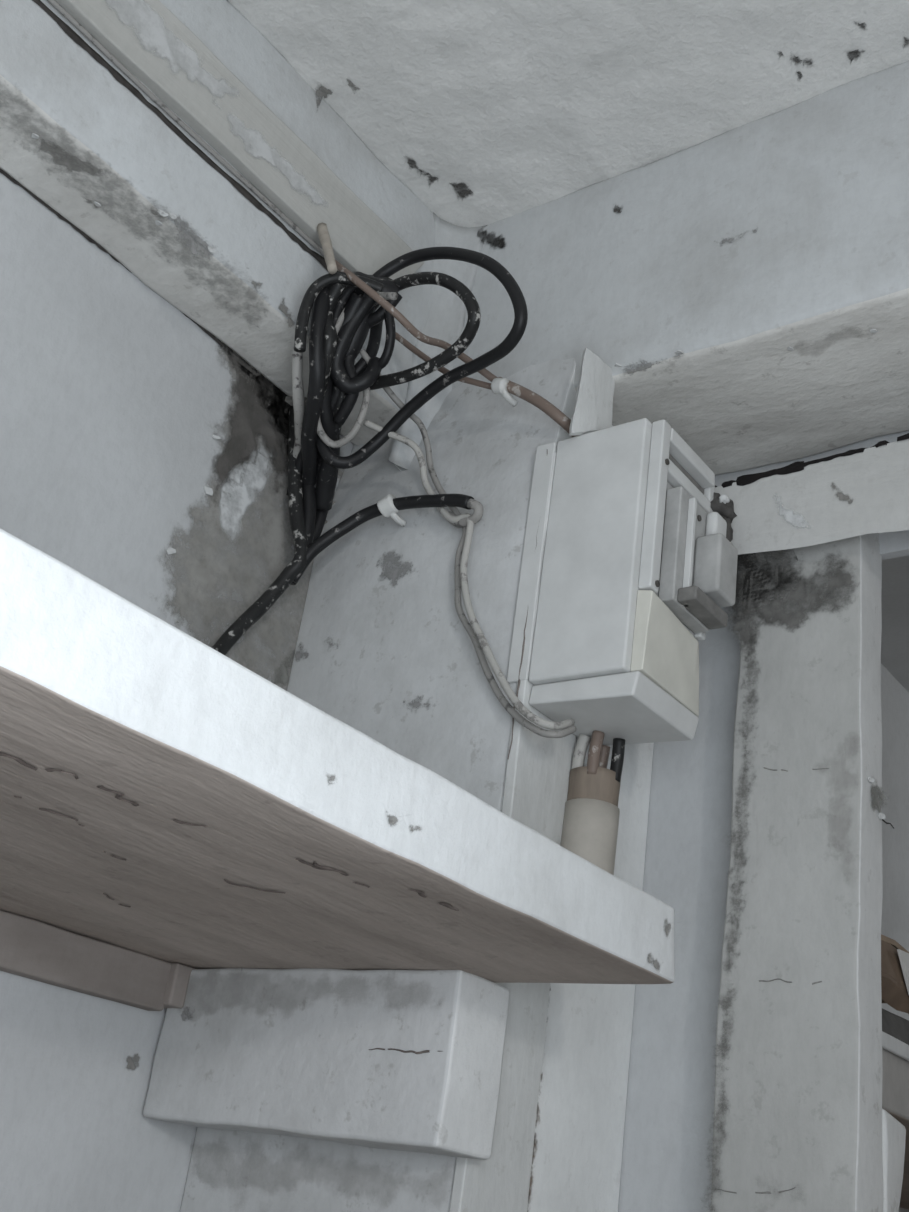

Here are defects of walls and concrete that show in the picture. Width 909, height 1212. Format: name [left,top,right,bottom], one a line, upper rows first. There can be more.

spalling [32,133,101,176]
peeling [165,345,314,691]
crack [0,752,139,806]
crack [14,796,85,827]
crack [173,819,206,827]
crack [224,879,286,894]
crack [295,858,370,888]
crack [408,889,459,911]